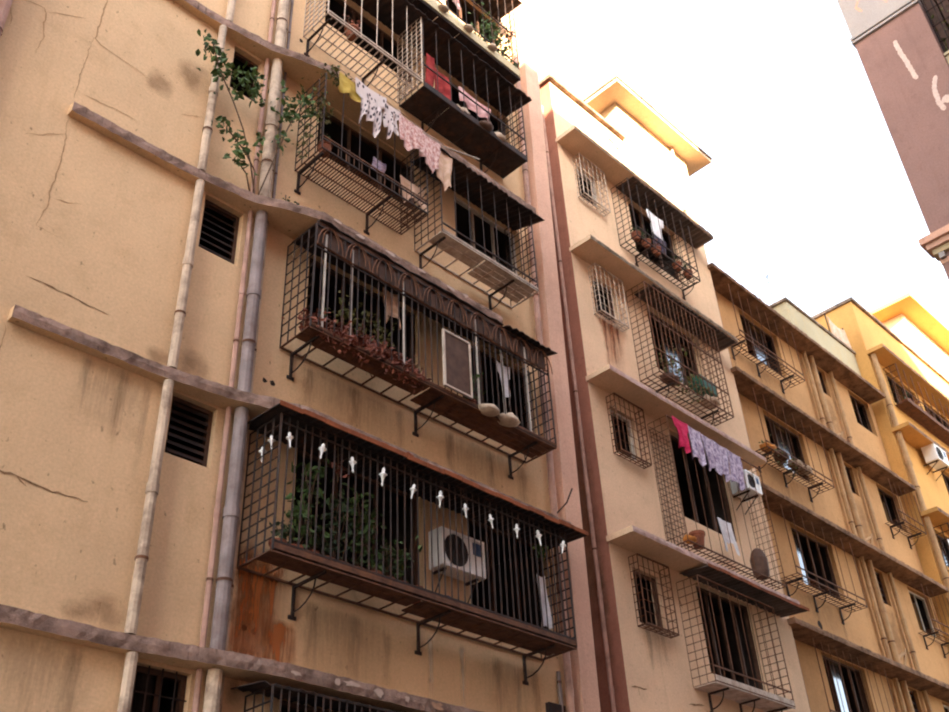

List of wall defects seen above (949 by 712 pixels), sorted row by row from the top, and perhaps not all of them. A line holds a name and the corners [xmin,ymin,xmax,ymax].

crack [10,0,152,119]
crack [26,118,81,237]
crack [27,276,108,315]
crack [0,470,88,502]
corrosion [234,551,292,662]